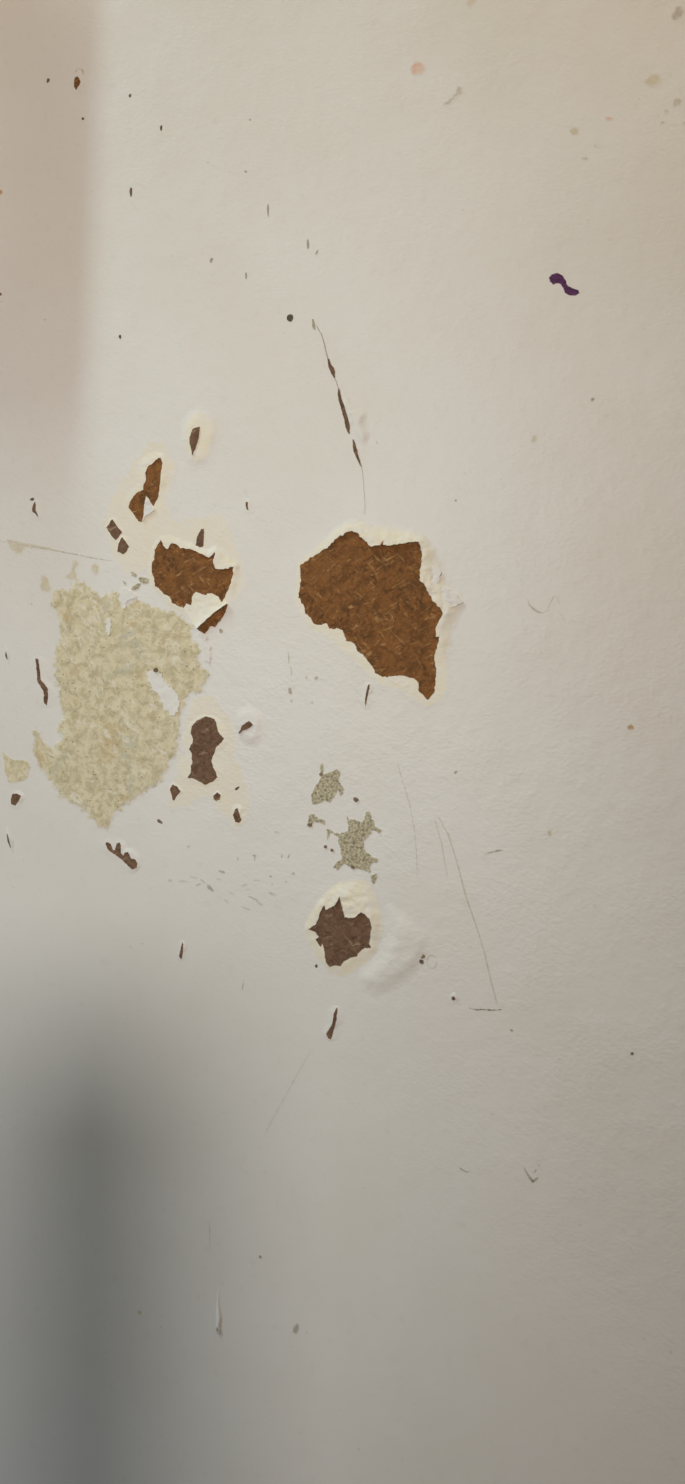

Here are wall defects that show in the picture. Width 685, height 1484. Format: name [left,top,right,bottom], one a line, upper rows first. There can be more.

crack [312,319,365,515]
peeling [1,452,246,874]
peeling [292,518,466,709]
peeling [304,763,384,978]